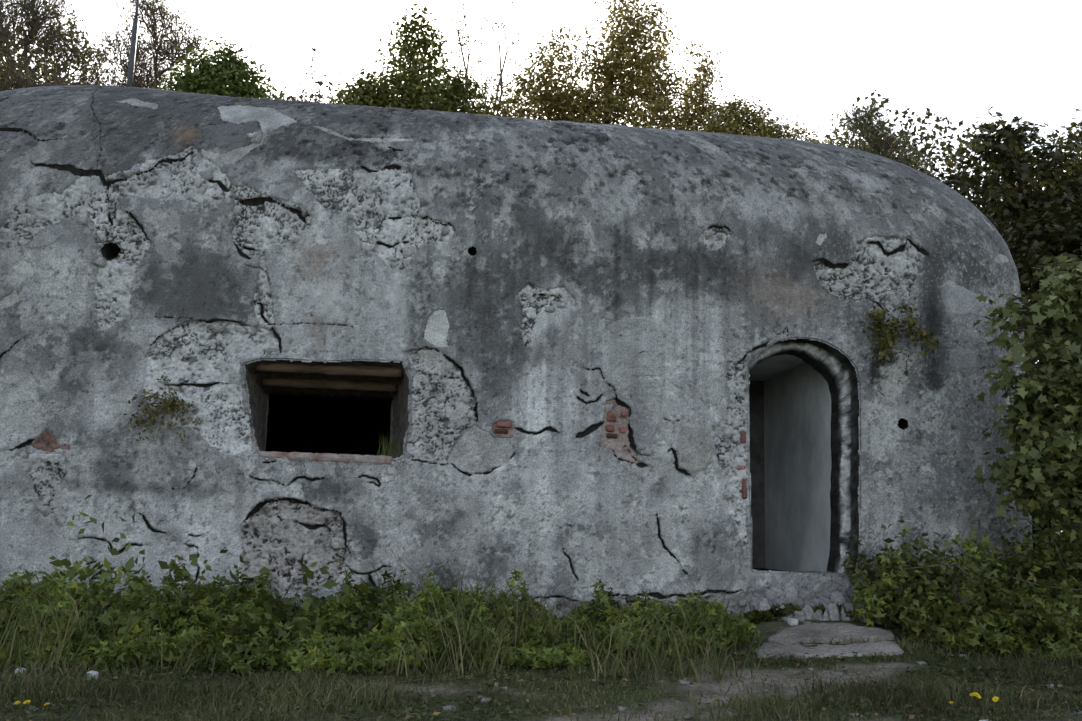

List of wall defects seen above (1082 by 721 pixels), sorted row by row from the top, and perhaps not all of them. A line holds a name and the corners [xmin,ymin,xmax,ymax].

crack [0,89,193,239]
spalling [118,99,158,109]
crack [208,180,310,223]
spalling [314,126,413,143]
spalling [293,168,454,270]
crack [359,146,404,172]
spalling [0,105,312,455]
spalling [814,236,925,314]
spalling [406,310,514,475]
spalling [241,498,348,594]
crack [534,519,578,601]
crack [613,515,741,603]